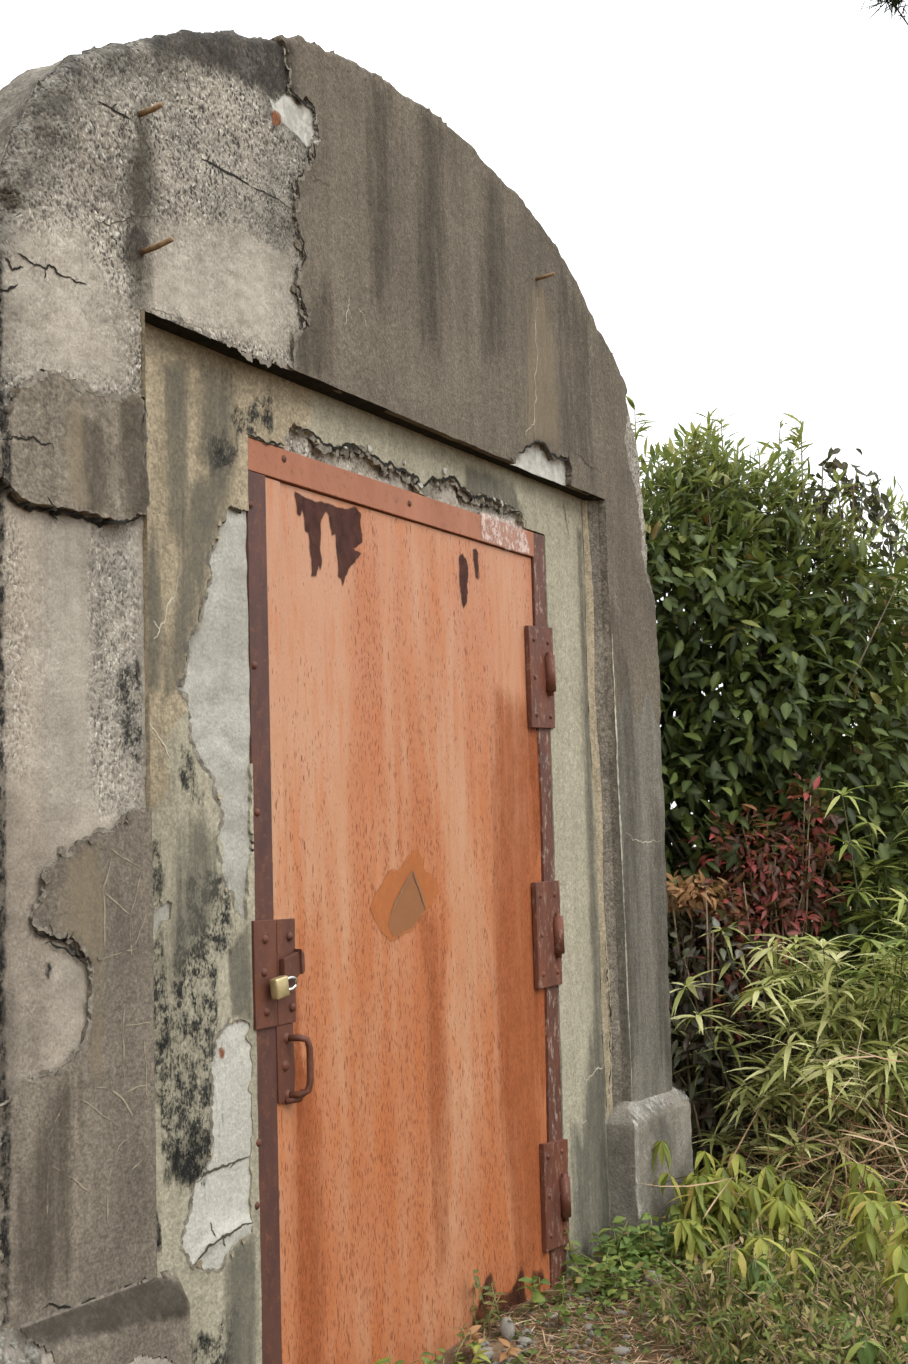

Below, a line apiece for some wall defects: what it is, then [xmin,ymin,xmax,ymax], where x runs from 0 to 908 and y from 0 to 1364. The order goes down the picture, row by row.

crack [0,252,87,292]
spalling [0,29,320,430]
crack [202,87,330,329]
crack [0,430,141,528]
rust [295,492,362,585]
rust [459,549,479,608]
spalling [0,485,149,1101]
flaking render [176,508,252,919]
damp [152,827,251,1187]
flaking render [180,1017,253,1274]
crack [194,1222,254,1265]
rust [473,1269,544,1329]